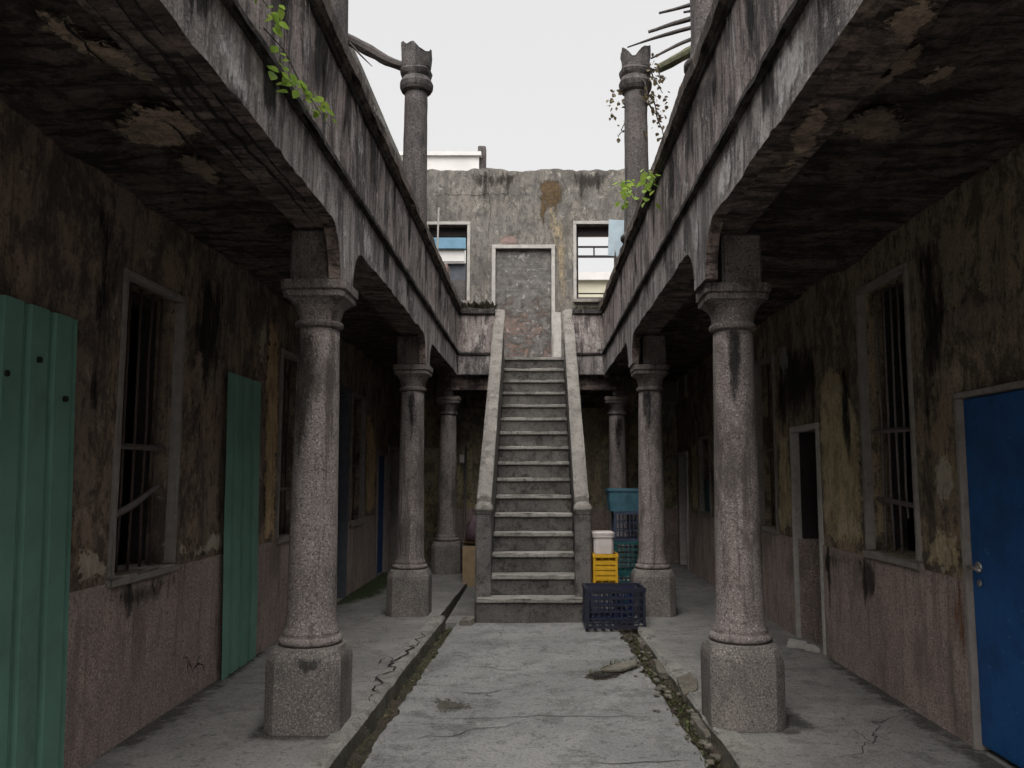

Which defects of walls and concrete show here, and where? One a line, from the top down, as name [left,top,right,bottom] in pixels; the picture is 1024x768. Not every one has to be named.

spalling [36,10,154,82]
spalling [770,0,959,191]
spalling [102,103,227,188]
water stain [842,366,851,454]
flaking render [76,547,107,584]
water stain [860,560,875,603]
flaking render [927,529,961,573]
crack [369,632,425,701]
spalling [584,662,642,681]